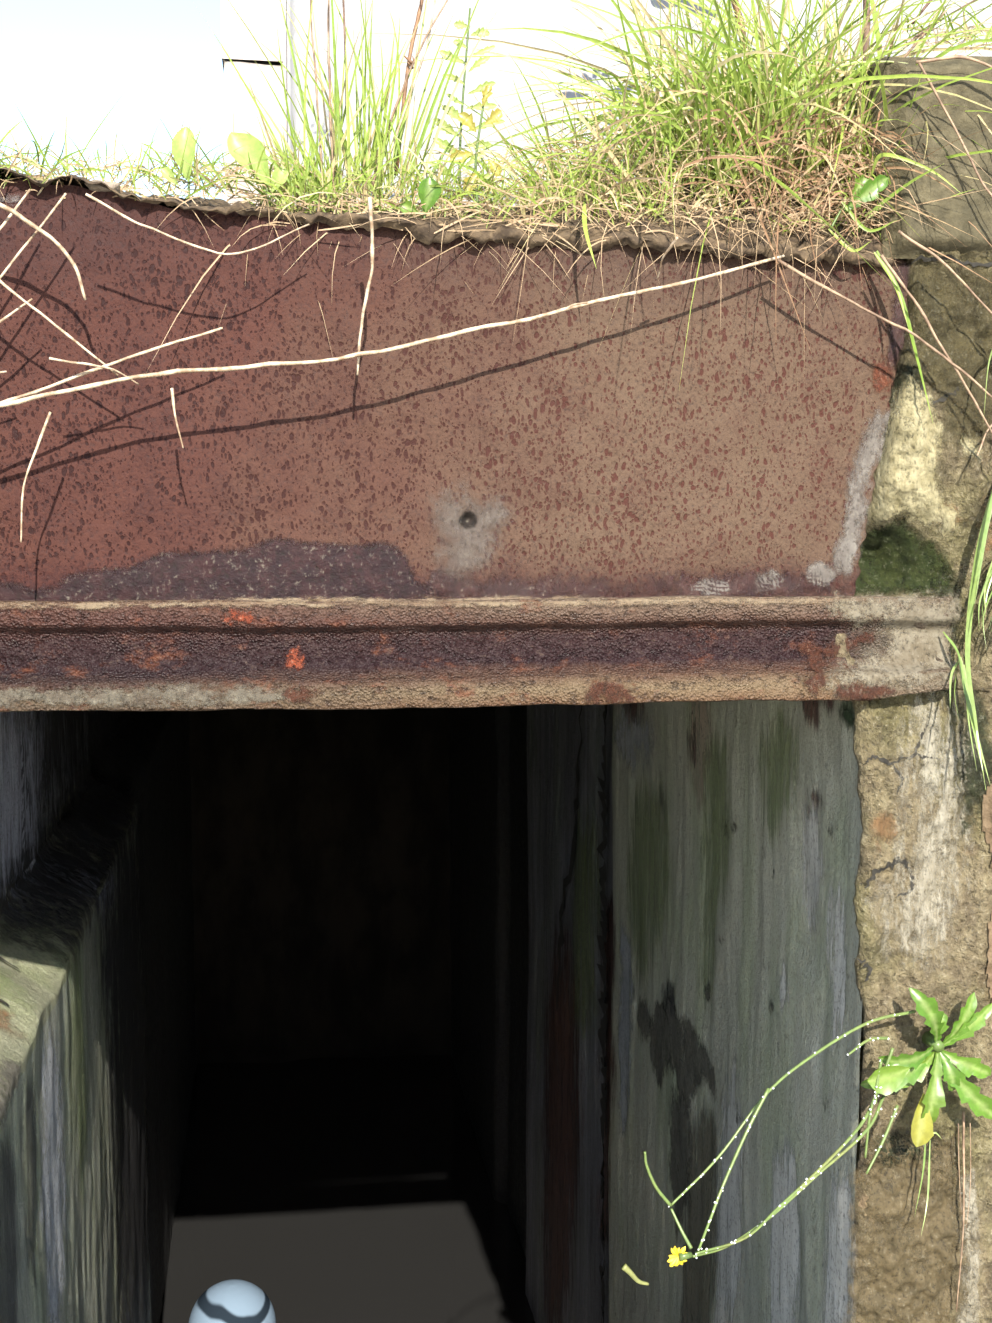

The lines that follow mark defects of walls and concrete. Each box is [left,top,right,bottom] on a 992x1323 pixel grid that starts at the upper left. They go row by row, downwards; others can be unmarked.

corrosion [872,263,909,392]
corrosion [0,411,890,625]
corrosion [287,646,304,669]
corrosion [586,681,635,704]
corrosion [798,632,896,701]
damp [0,684,288,1323]